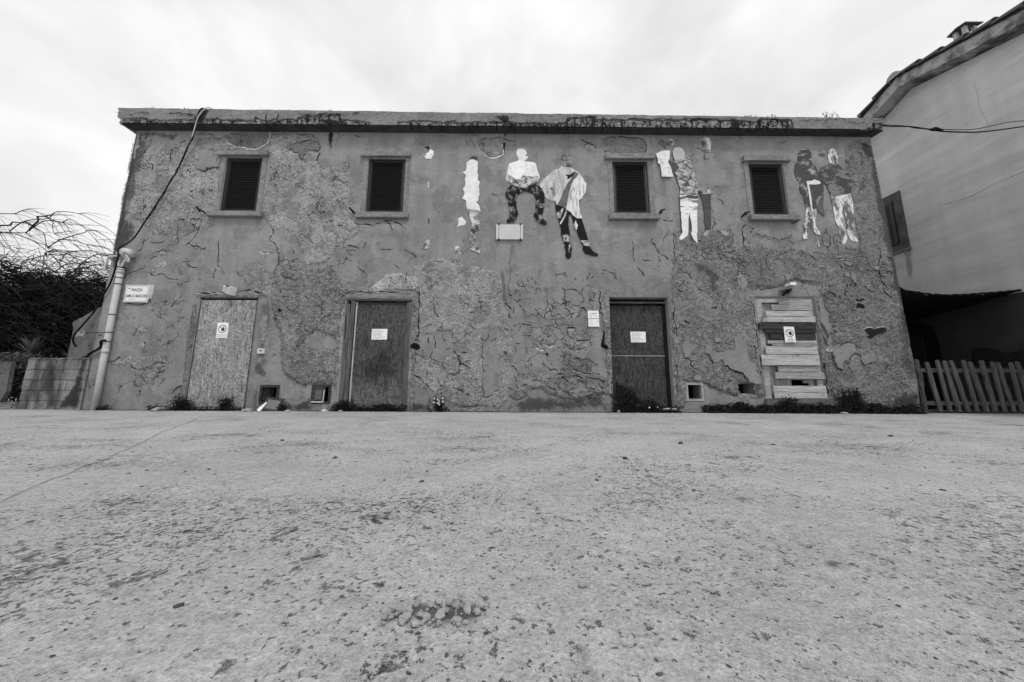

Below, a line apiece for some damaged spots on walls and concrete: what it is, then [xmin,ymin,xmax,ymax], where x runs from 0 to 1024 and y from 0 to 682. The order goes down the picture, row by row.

peeling [107,327,168,384]
crack [125,214,312,333]
peeling [122,114,920,412]
crack [285,113,893,402]